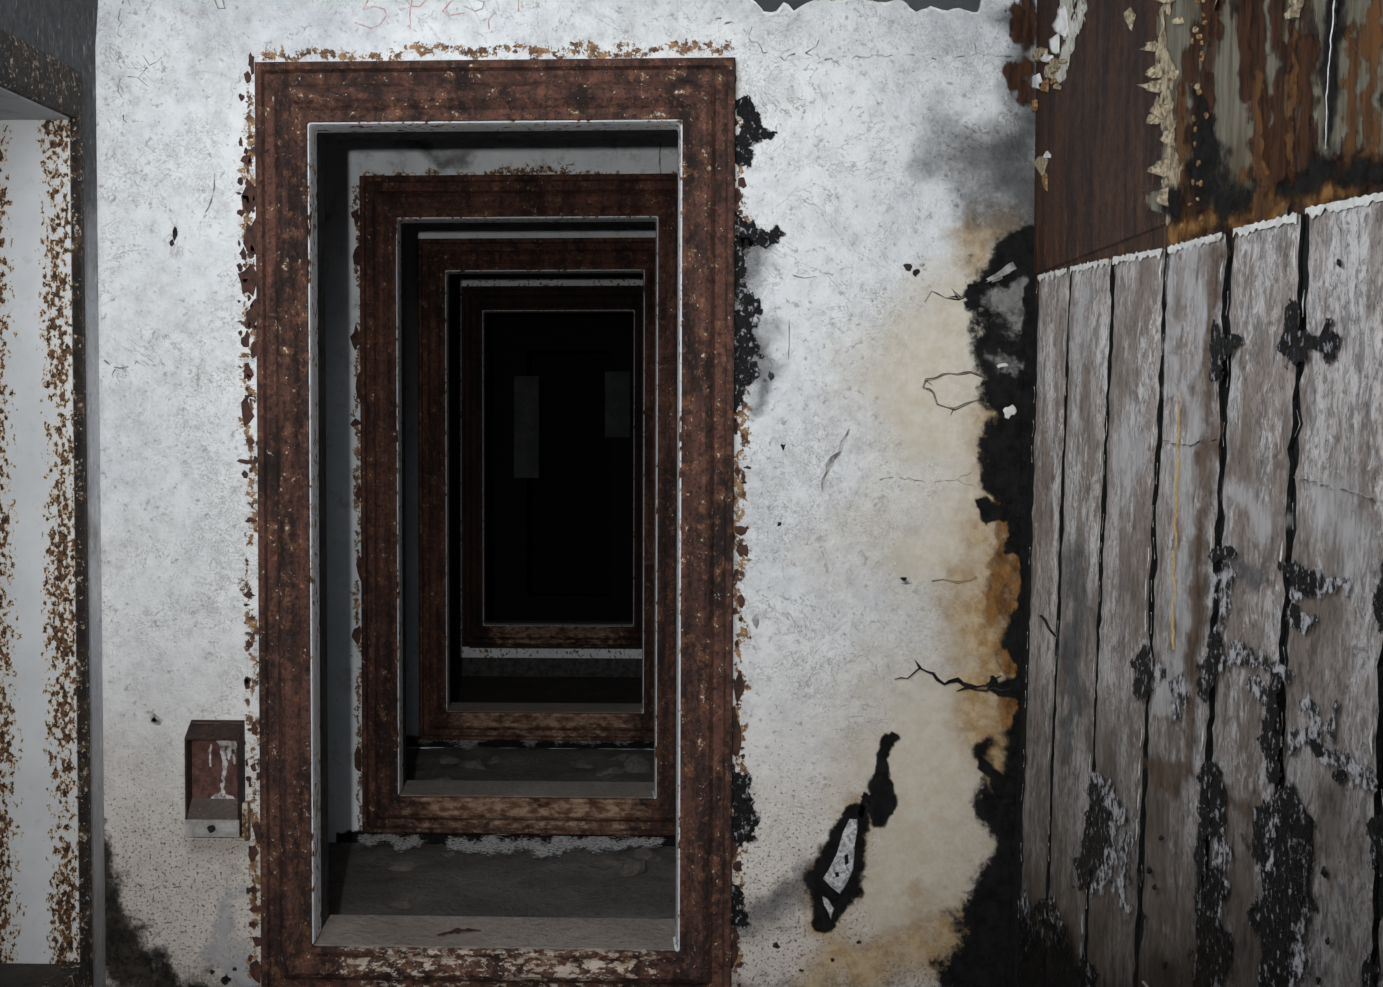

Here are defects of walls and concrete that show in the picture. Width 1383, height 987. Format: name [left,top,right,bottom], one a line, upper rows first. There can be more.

rust [259,38,734,62]
flaking render [751,0,984,15]
peeling [1032,0,1383,293]
damp [1277,298,1340,370]
crack [922,371,984,415]
rust [237,294,261,979]
peeling [732,670,745,759]
rust [732,387,752,775]
crack [896,660,1010,692]
damp [977,269,1098,987]
damp [1130,246,1317,987]
damp [1372,562,1383,634]